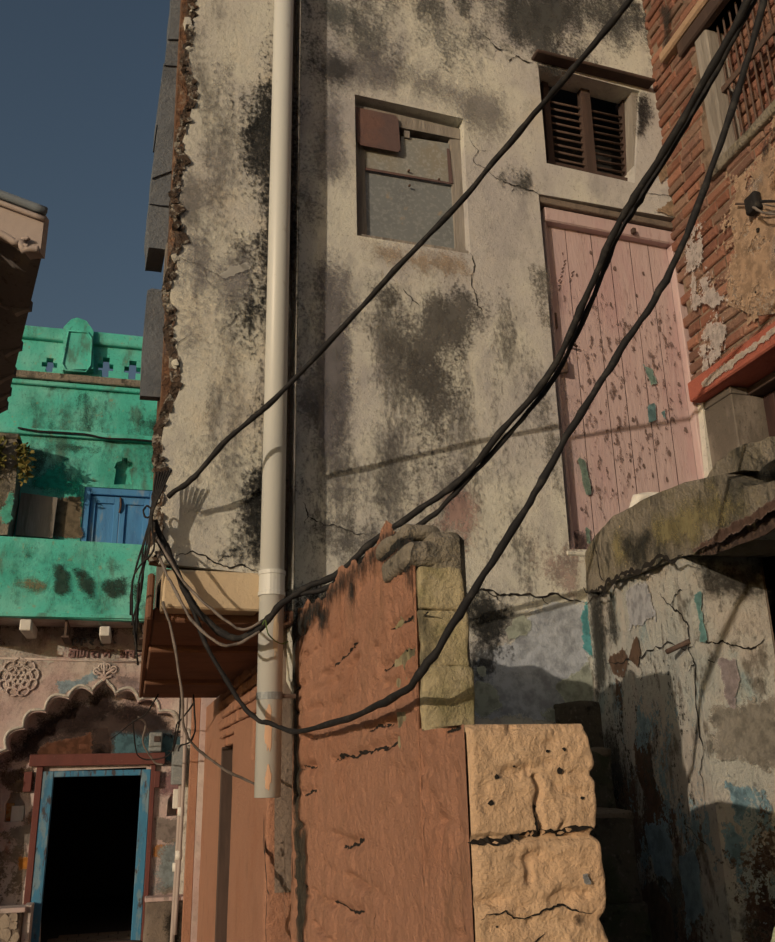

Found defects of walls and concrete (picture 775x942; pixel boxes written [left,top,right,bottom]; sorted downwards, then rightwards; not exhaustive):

leakage [301,0,647,180]
spalling [148,0,199,563]
leakage [172,62,272,354]
flaking render [696,116,775,329]
leakage [53,564,140,610]
leakage [217,445,263,567]
leakage [299,261,517,553]
crack [477,543,683,605]
peeling [472,600,698,899]
crack [606,589,764,799]
peeling [708,657,775,942]
crack [482,904,592,942]